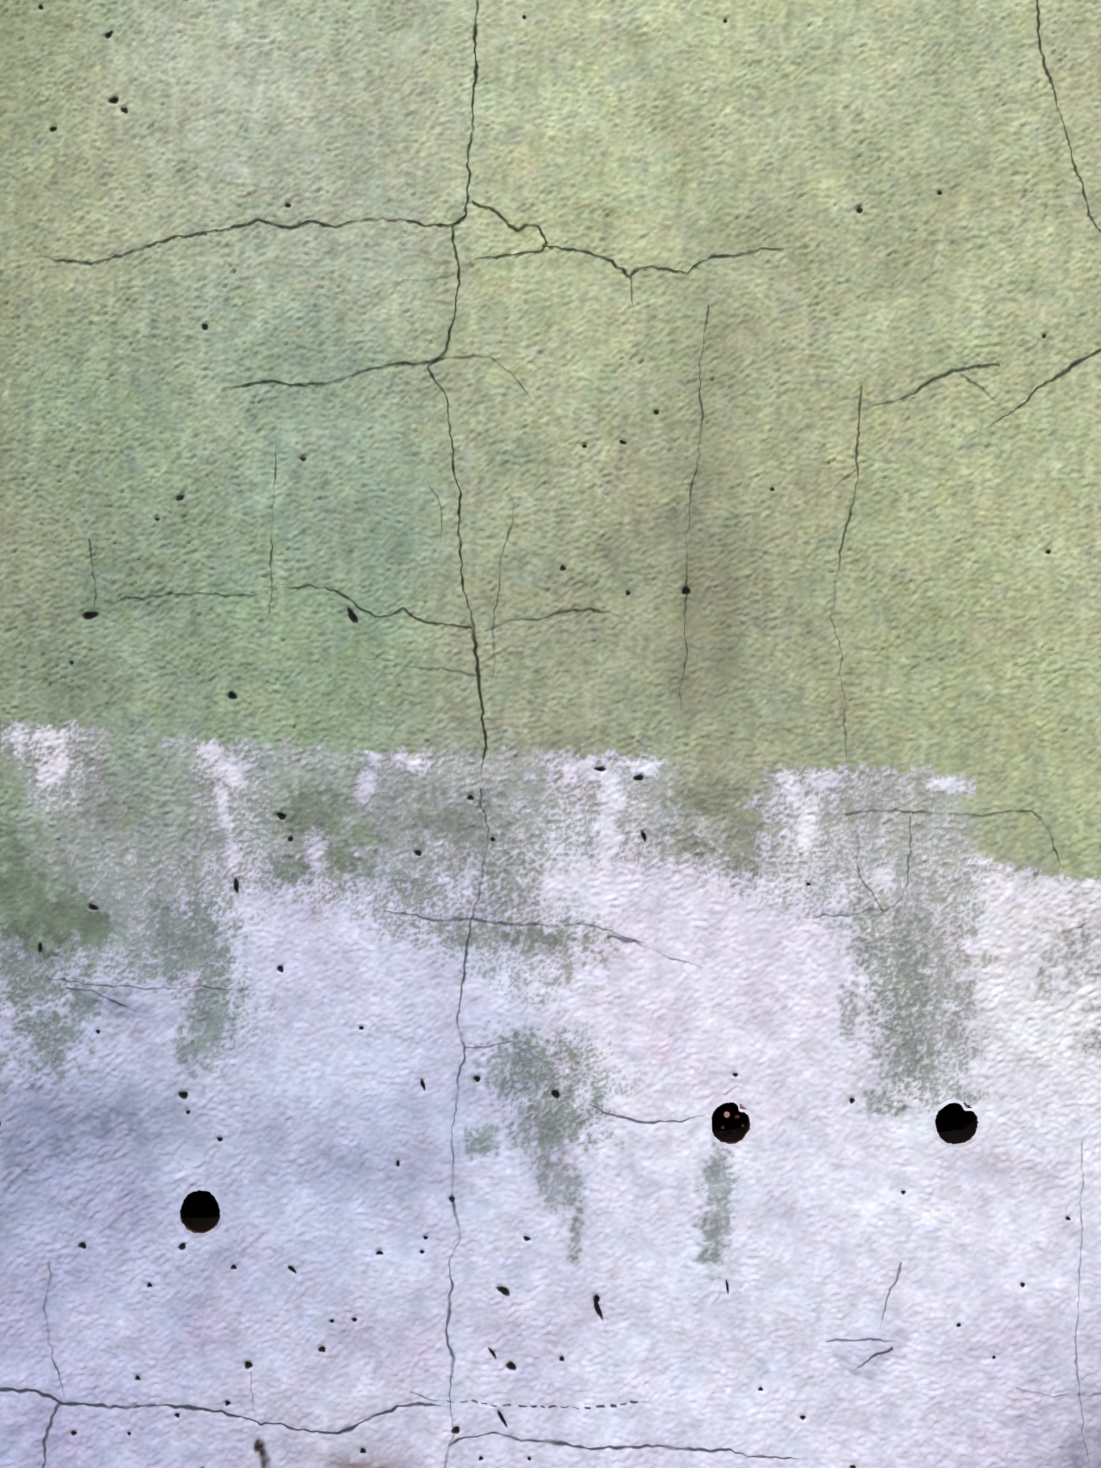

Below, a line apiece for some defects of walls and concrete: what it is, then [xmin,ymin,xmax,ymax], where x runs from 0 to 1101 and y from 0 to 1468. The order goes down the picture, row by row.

crack [1036,0,1101,231]
crack [51,0,783,831]
crack [856,363,1000,472]
crack [988,349,1101,427]
crack [597,926,635,942]
crack [53,978,188,1006]
crack [383,910,543,1078]
crack [591,1105,702,1123]
crack [0,1259,796,1468]
crack [826,1263,901,1367]